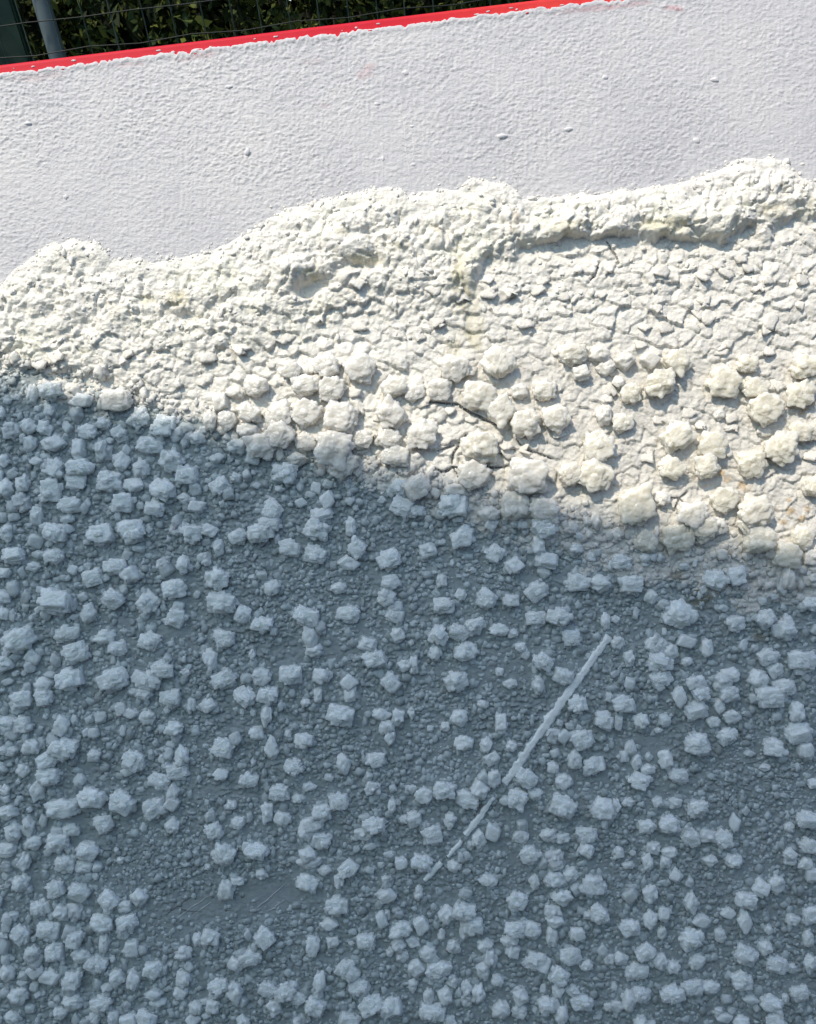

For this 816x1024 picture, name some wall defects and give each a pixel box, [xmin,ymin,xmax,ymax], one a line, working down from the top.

crack [429,401,551,478]